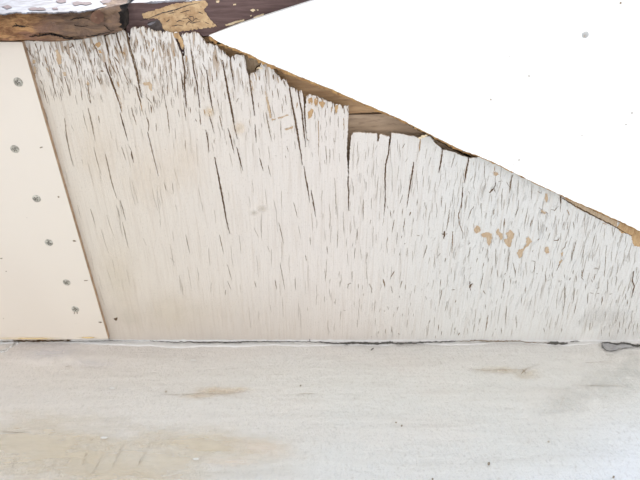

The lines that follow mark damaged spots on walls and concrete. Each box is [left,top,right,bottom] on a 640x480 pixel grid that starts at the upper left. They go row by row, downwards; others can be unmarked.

peeling [0,0,111,15]
peeling [141,0,216,50]
peeling [307,96,326,119]
crack [2,17,638,350]
peeling [474,226,515,247]
peeling [562,198,640,247]